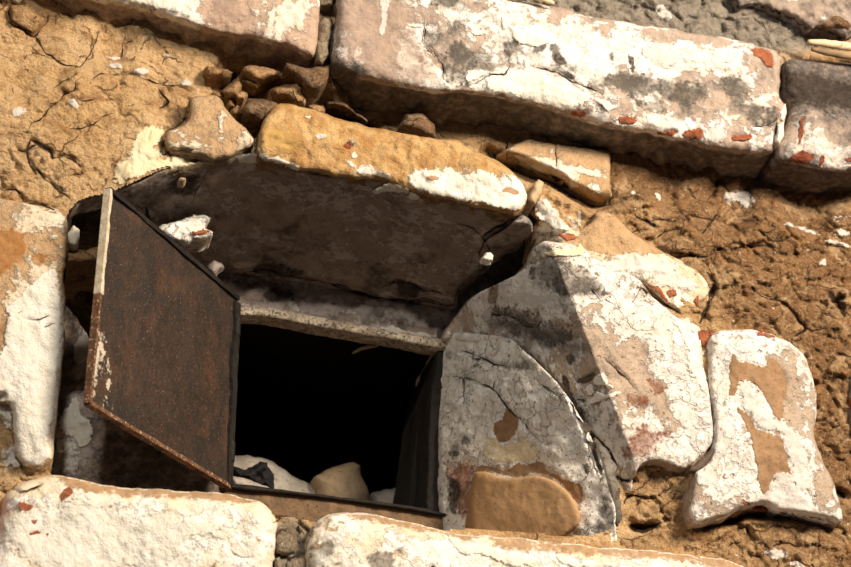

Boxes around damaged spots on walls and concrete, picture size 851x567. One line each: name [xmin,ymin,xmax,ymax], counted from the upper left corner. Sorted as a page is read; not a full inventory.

crack [0,8,194,210]
crack [532,66,604,95]
crack [634,179,718,237]
peeling [0,266,93,469]
rust [83,293,102,404]
crack [453,351,549,446]
peeling [493,409,519,442]
crack [534,357,670,504]
crack [677,229,792,323]
peeling [729,353,822,520]
crack [751,287,824,336]
peeling [475,461,583,510]